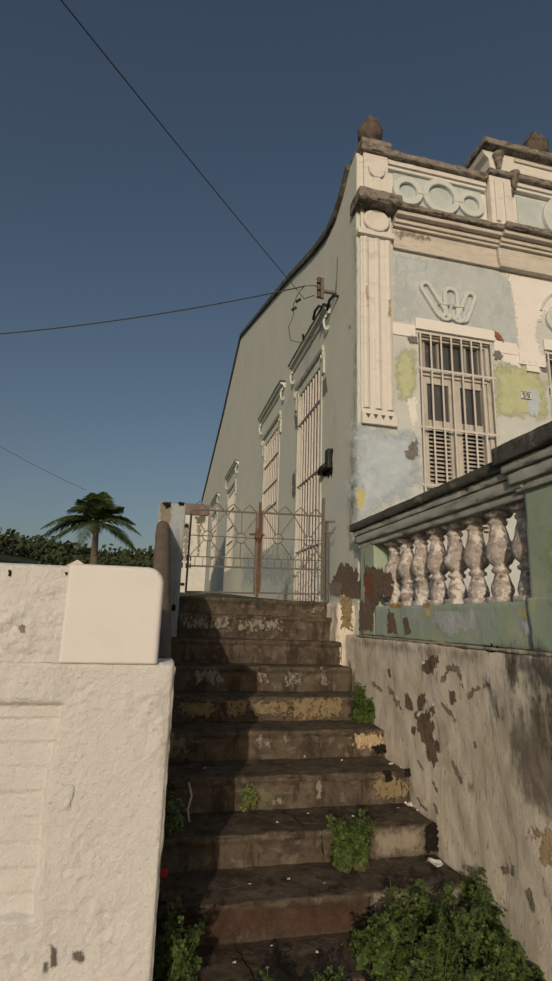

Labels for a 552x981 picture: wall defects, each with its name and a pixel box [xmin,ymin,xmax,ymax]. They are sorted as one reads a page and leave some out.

peeling [392,251,552,419]
peeling [354,335,422,522]
spalling [329,562,411,635]
peeling [423,602,479,637]
flaking render [169,737,190,757]
peeling [175,696,346,720]
spalling [350,732,387,755]
spalling [370,655,489,854]
water stain [508,641,552,817]
flaking render [529,822,552,867]
peeling [525,888,535,913]